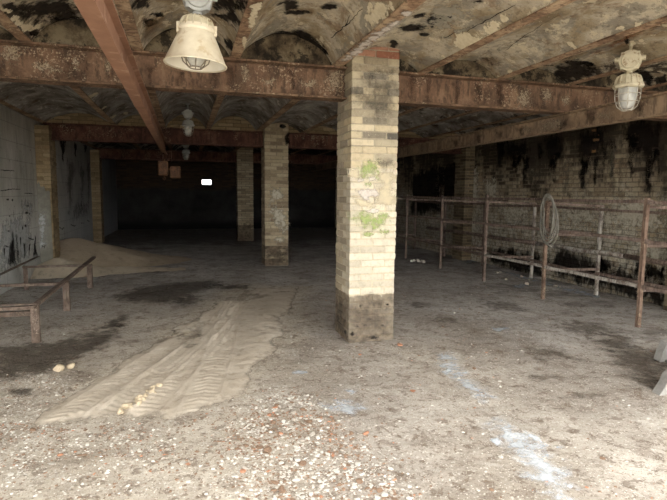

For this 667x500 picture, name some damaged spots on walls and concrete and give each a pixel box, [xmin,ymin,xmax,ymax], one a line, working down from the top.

peeling [247,2,262,28]
peeling [364,1,395,28]
peeling [428,4,509,49]
leakage [579,139,616,189]
leakage [645,149,660,194]